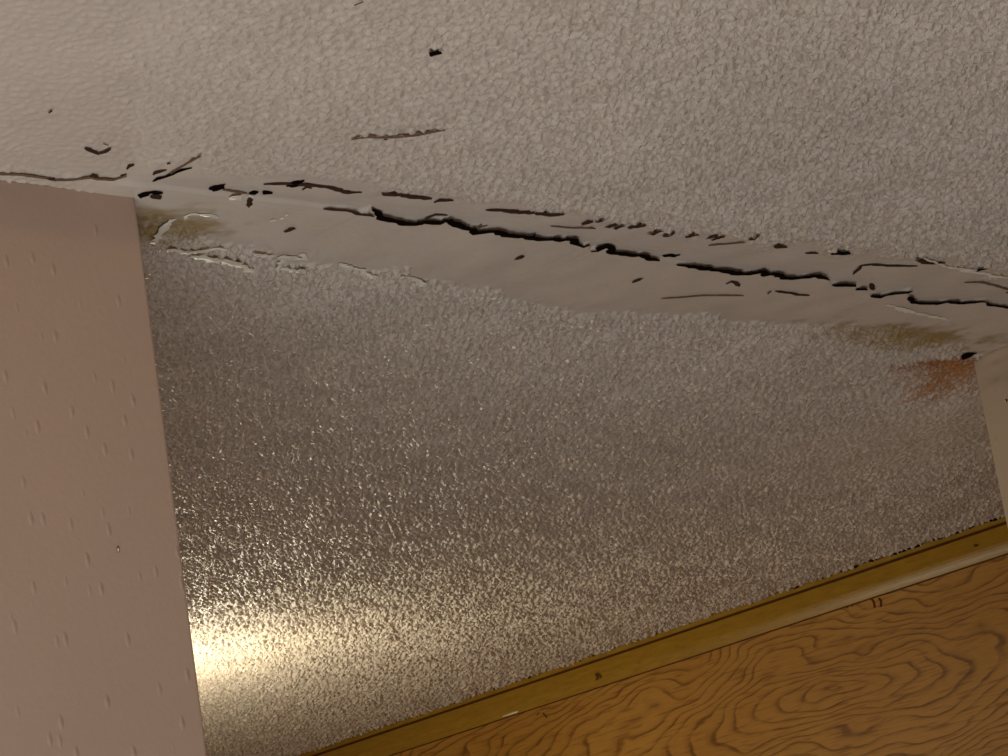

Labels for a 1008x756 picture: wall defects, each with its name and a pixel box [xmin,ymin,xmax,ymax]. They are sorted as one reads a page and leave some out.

crack [0,143,201,200]
flaking render [209,184,256,201]
peeling [151,213,255,273]
crack [223,183,1008,309]
spalling [581,219,725,241]